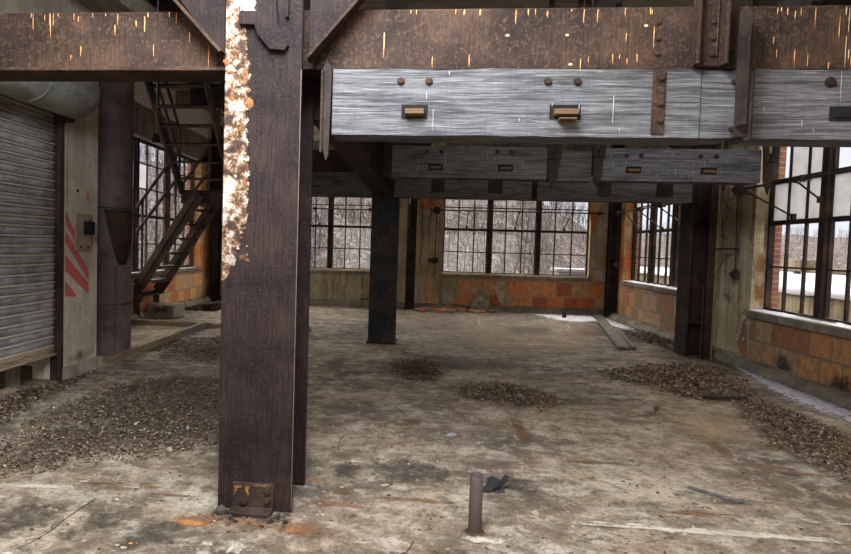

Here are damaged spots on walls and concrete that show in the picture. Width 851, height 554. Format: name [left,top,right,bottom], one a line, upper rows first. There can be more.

peeling [222,0,257,280]